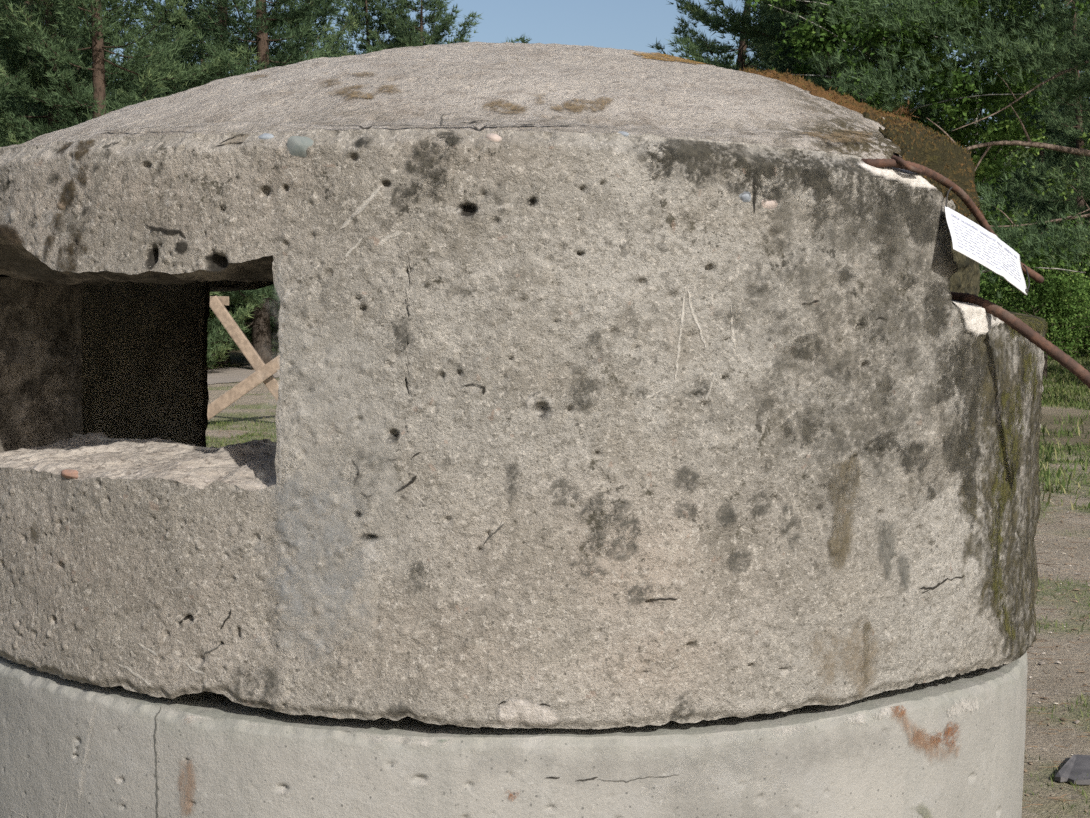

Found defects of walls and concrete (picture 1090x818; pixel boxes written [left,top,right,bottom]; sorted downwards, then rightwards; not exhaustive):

water stain [572,379,597,413]
water stain [636,139,982,566]
water stain [553,479,639,575]
water stain [991,314,1048,639]
crack [153,707,161,818]
rust [895,706,958,752]